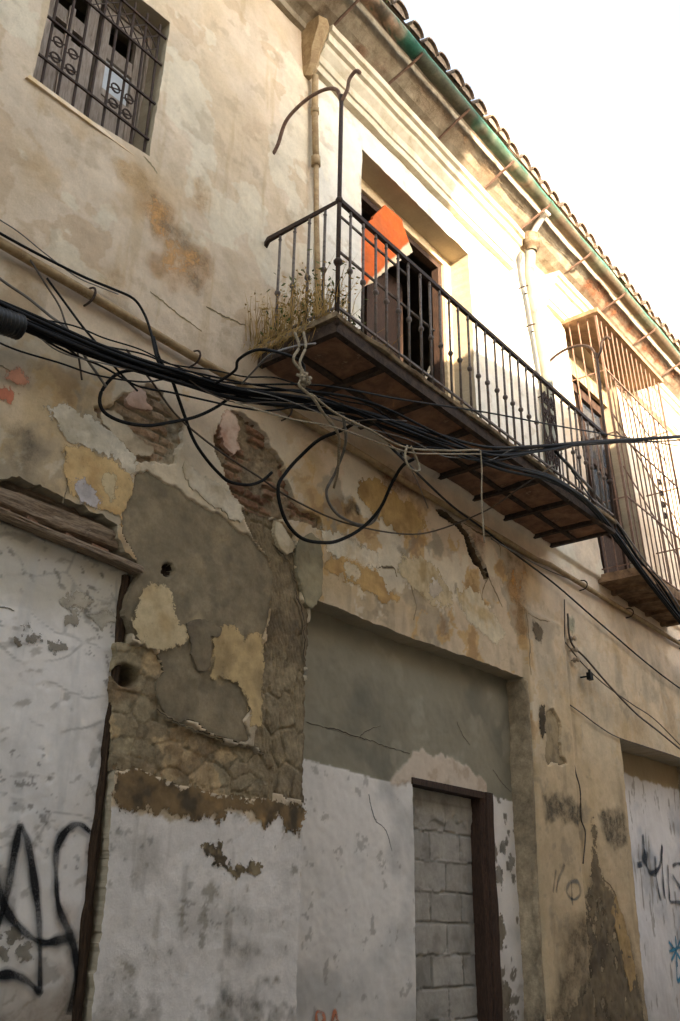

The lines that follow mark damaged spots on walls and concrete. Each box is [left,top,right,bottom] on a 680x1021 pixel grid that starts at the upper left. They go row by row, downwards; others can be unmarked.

peeling [0,367,31,405]
peeling [357,477,427,539]
flaking render [436,509,487,579]
flaking render [43,386,400,837]
peeling [397,552,506,646]
peeling [532,619,543,642]
crack [306,722,410,754]
flaking render [539,705,565,765]
peeling [200,839,263,880]